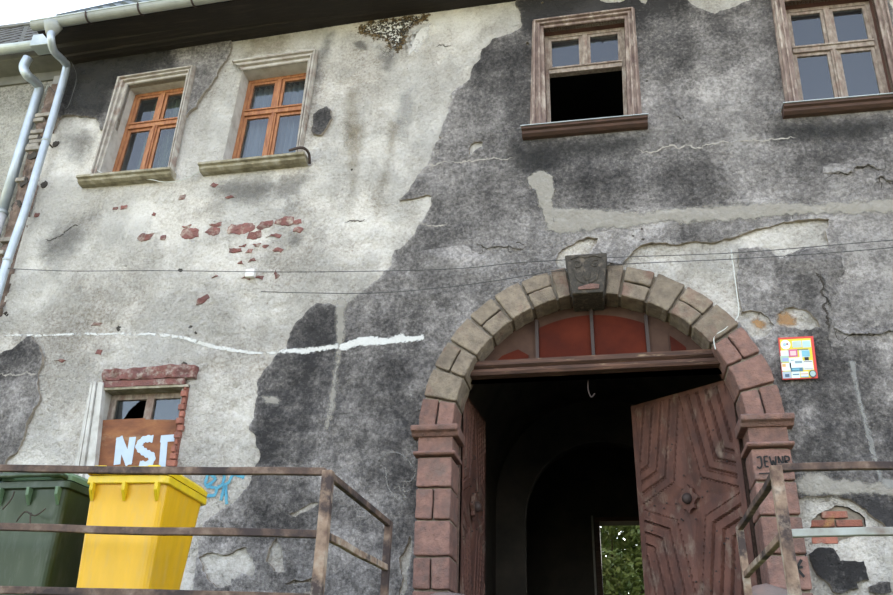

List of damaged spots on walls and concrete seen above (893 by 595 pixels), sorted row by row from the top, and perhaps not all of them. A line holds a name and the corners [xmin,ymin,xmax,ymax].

peeling [688,0,749,14]
crack [640,136,794,153]
peeling [823,157,885,174]
crack [827,166,893,188]
peeling [0,1,522,595]
peeling [556,220,828,340]
crack [816,273,875,347]
peeling [798,495,893,595]